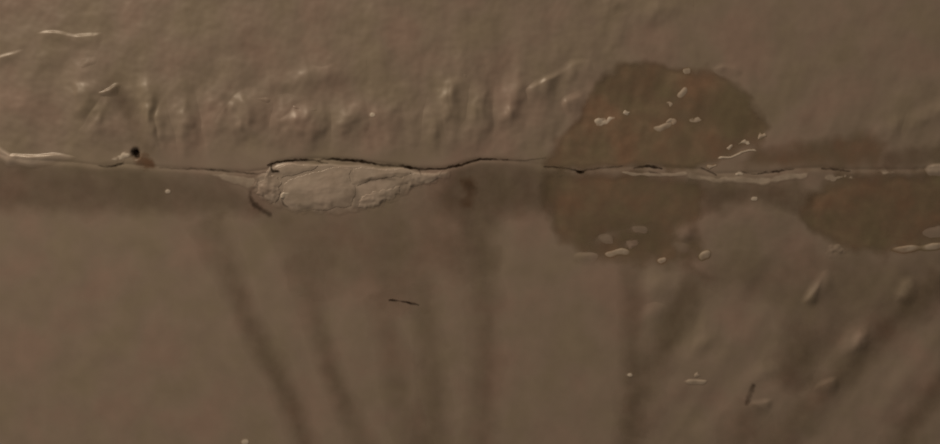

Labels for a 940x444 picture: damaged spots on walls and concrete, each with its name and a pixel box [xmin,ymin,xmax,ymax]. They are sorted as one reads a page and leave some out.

peeling [207,161,451,217]
crack [267,158,507,172]